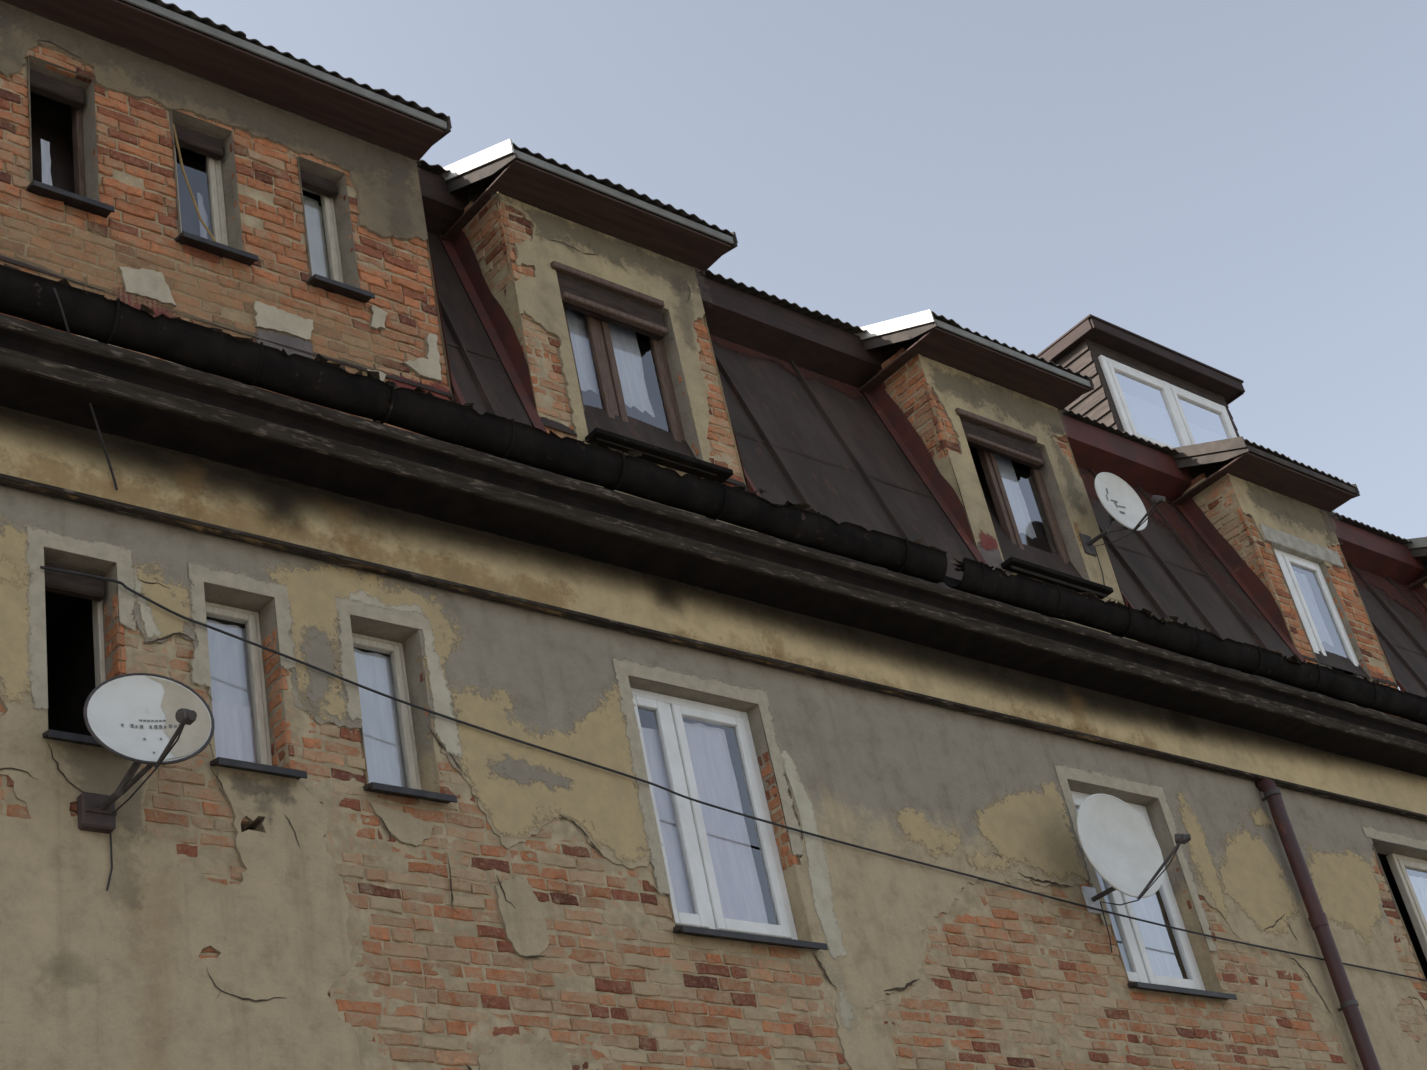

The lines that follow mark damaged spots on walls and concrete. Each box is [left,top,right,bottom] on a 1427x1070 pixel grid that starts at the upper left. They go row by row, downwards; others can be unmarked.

flaking render [0,42,450,401]
flaking render [209,373,434,439]
flaking render [462,191,578,439]
flaking render [877,348,962,465]
peeling [0,517,32,717]
flaking render [1183,465,1317,664]
flaking render [1326,544,1396,688]
flaking render [0,774,31,819]
flaking render [263,563,1359,1070]
crack [206,967,284,1002]
peeling [1307,846,1427,1043]